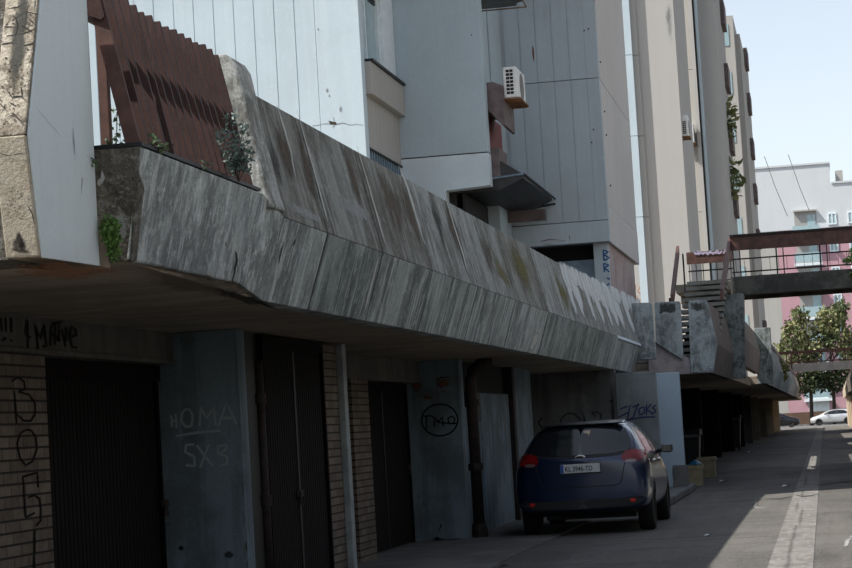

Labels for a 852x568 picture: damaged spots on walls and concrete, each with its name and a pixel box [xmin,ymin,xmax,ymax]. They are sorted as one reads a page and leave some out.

crack [2,0,37,46]
crack [0,88,26,124]